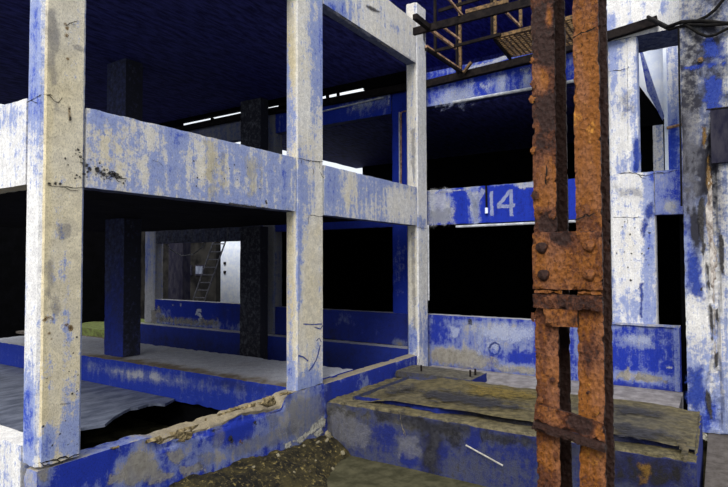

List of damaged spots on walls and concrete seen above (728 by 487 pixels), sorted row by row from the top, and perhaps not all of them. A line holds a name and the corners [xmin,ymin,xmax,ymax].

spalling [64,148,126,184]
rust [531,191,556,220]
spalling [217,391,294,416]